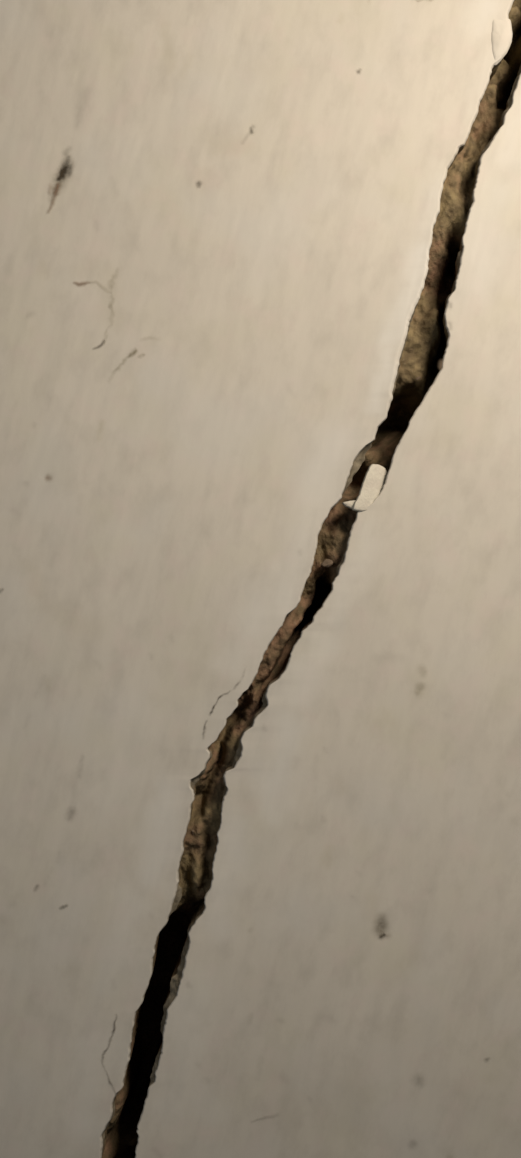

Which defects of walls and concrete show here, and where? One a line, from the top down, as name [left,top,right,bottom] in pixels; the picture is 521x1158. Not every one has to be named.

crack [501,65,521,126]
crack [478,138,493,167]
crack [455,239,463,274]
crack [392,303,418,395]
crack [342,441,373,497]
crack [352,464,387,511]
crack [320,559,333,568]
crack [332,537,349,583]
crack [223,665,287,776]
crack [190,747,212,794]
crack [161,936,189,1036]
crack [149,1050,161,1086]